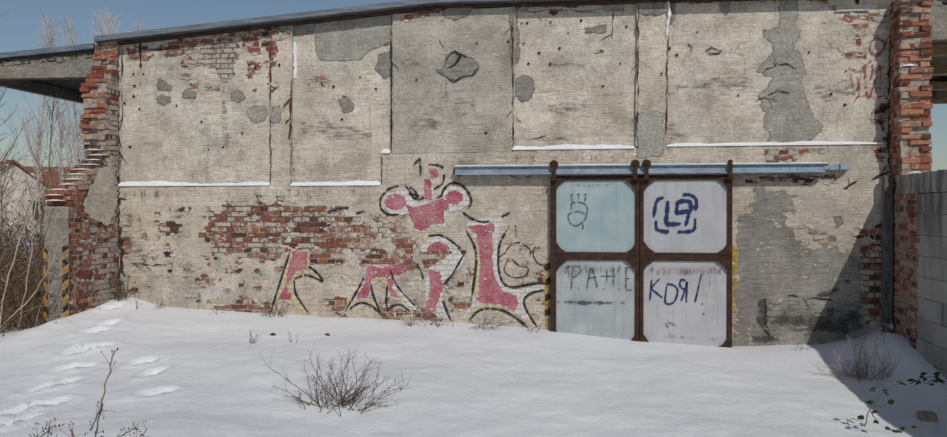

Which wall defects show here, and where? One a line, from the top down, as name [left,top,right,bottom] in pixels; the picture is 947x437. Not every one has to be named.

spalling [126,27,294,92]
crack [117,43,169,287]
spalling [118,221,148,258]
spalling [154,206,191,257]
spalling [182,190,467,314]
flaking render [732,147,882,346]
spalling [324,296,348,318]